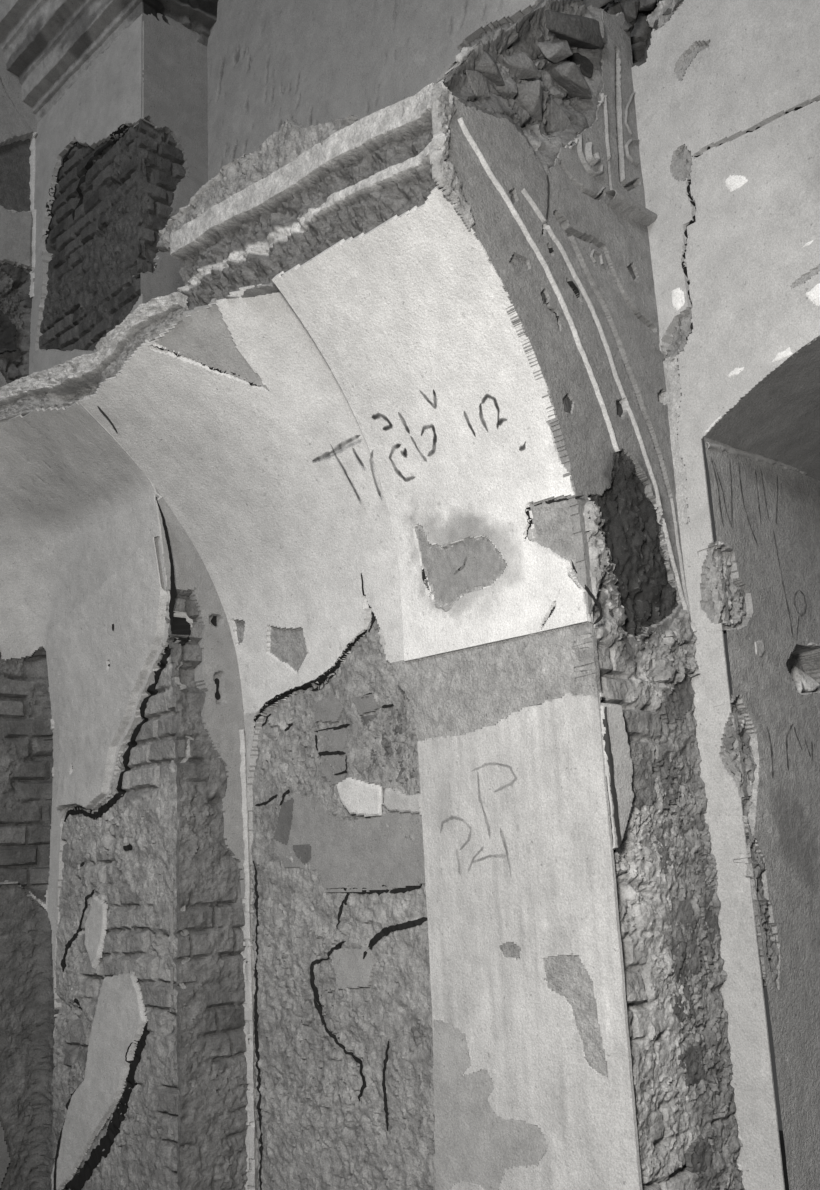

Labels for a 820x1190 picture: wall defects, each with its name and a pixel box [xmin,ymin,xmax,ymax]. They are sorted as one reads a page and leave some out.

spalling [0,47,475,422]
crack [682,127,760,343]
crack [310,884,428,1131]
spalling [0,451,747,1190]